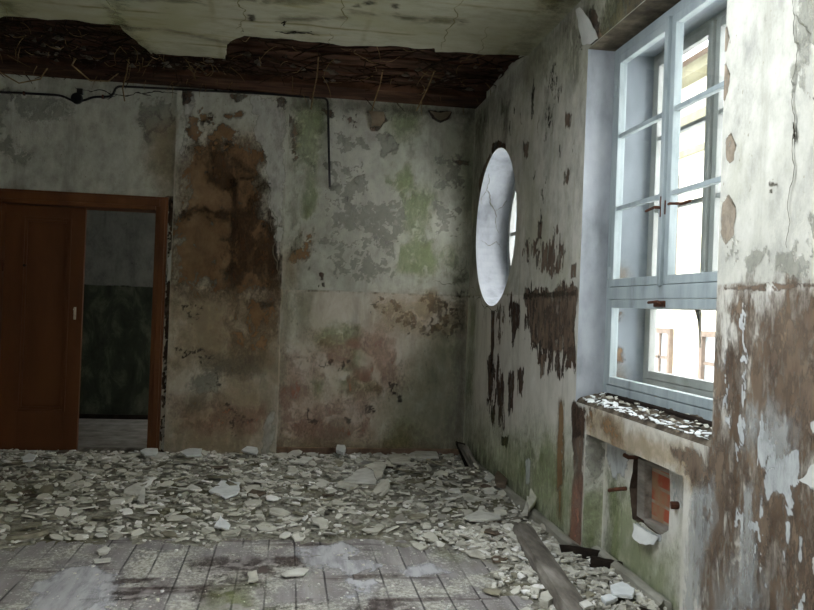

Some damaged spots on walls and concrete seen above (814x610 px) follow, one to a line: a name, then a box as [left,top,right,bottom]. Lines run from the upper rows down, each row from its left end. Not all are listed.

peeling [230,94,299,256]
crack [275,0,348,44]
spalling [531,64,562,130]
crack [786,0,809,248]
flaking render [159,196,211,452]
peeling [487,210,578,448]
peeling [691,195,814,610]
flaking render [632,523,662,545]